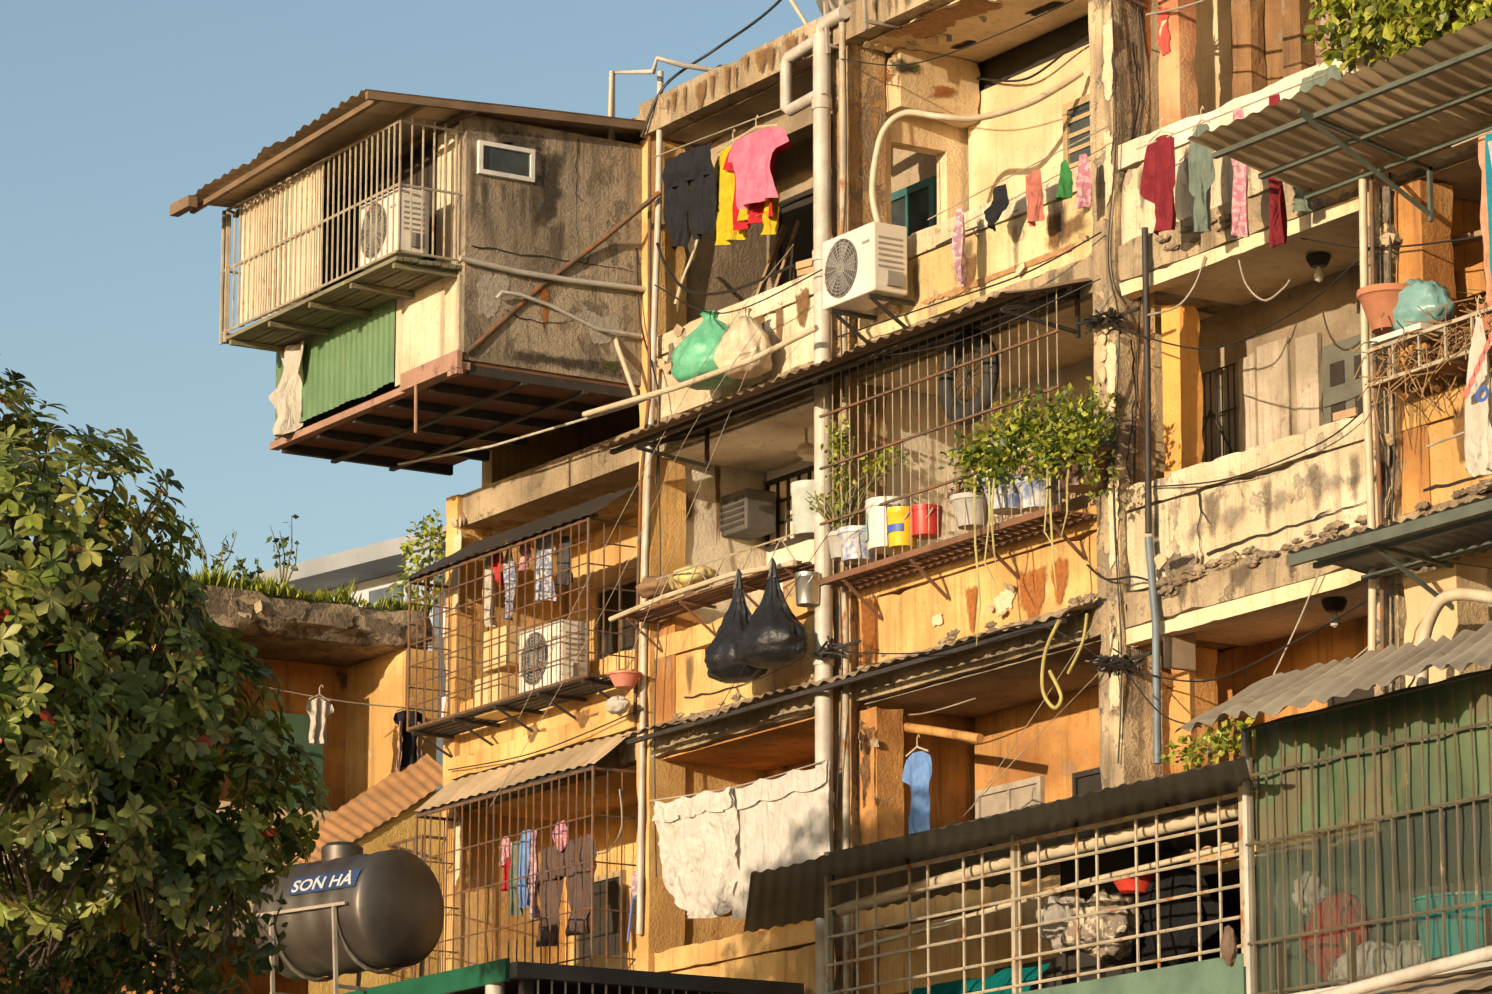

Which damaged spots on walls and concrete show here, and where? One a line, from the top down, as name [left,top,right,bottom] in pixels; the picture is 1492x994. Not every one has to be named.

peeling [863,0,1003,53]
peeling [1102,18,1113,101]
water stain [491,130,563,224]
peeling [1103,130,1114,209]
water stain [518,352,619,376]
peeling [1097,323,1118,426]
peeling [1108,479,1137,611]
water stain [1222,508,1244,528]
spalling [1154,433,1393,599]
spalling [932,613,960,649]
spalling [1067,592,1099,614]
peeling [1109,623,1140,711]